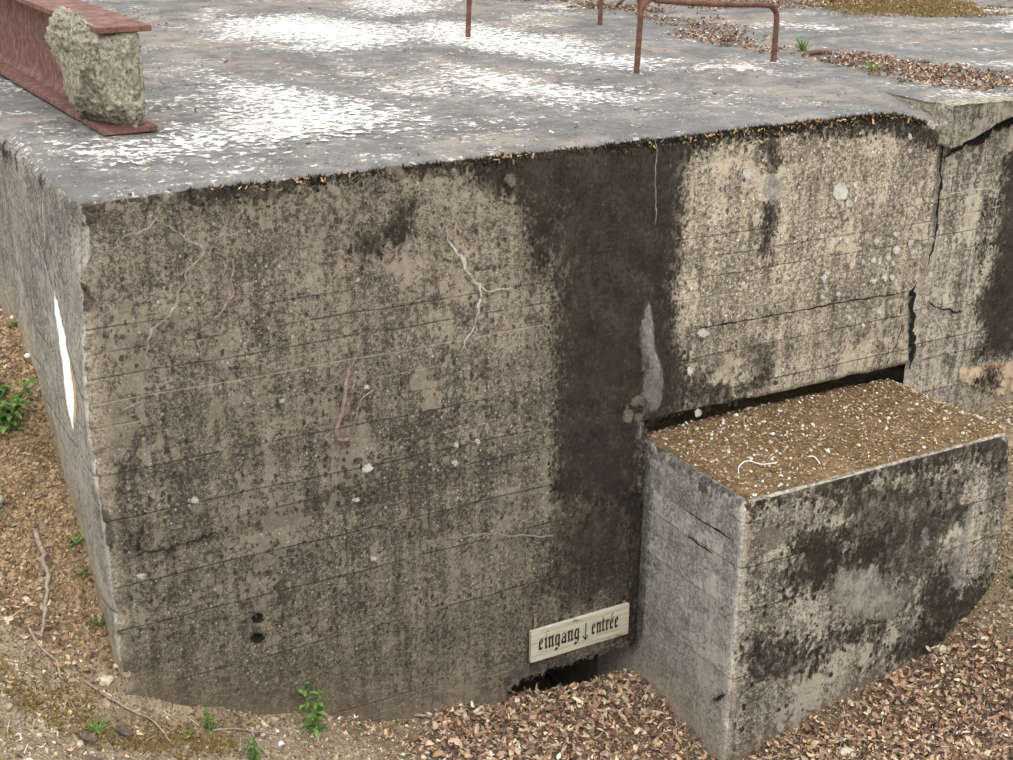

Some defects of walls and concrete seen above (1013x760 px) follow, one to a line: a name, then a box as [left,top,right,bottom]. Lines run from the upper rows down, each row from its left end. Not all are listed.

damp [519,139,778,653]
crack [447,0,1013,414]
damp [756,129,788,263]
damp [734,473,995,694]